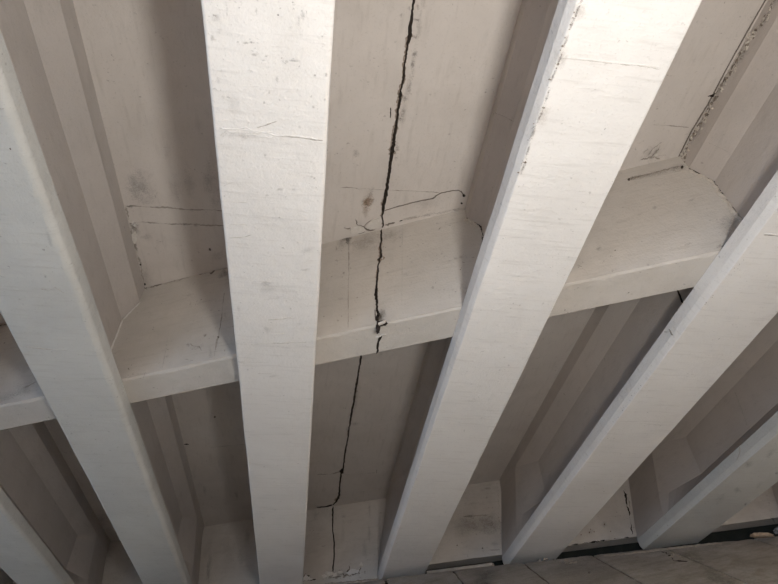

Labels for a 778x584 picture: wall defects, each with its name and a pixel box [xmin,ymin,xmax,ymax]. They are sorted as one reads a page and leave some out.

crack [218,120,323,141]
crack [317,0,466,571]